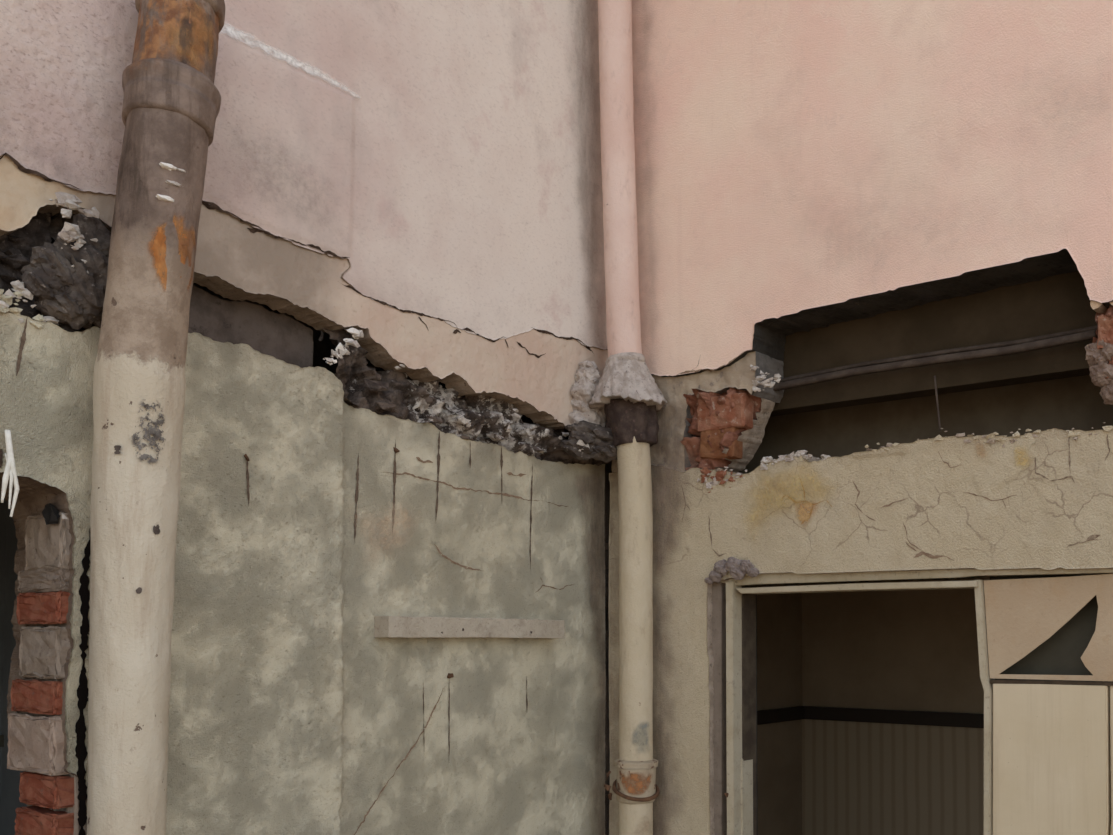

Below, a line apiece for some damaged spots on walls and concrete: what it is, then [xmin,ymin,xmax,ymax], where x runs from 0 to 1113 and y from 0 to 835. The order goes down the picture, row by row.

spalling [0,192,111,332]
rust [150,217,195,289]
spalling [188,285,617,466]
spalling [1085,305,1113,405]
peeling [114,402,165,464]
spalling [680,364,831,493]
crack [966,439,1075,508]
crack [681,485,727,557]
crack [780,477,921,550]
crack [1067,535,1100,547]
crack [75,529,91,835]
rust [622,773,651,794]